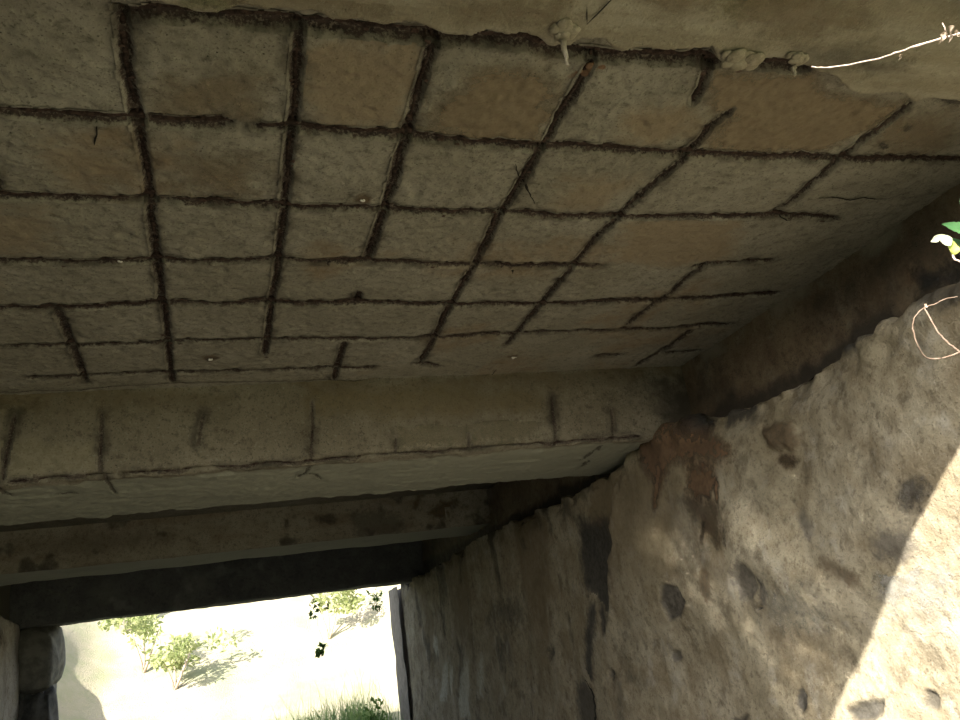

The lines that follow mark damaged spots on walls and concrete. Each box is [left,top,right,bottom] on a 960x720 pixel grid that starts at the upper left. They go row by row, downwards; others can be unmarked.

corrosion [302,38,422,142]
corrosion [415,49,559,141]
corrosion [599,70,899,152]
corrosion [0,121,141,258]
spalling [0,1,960,384]
corrosion [534,167,756,273]
corrosion [639,422,733,511]
damp [864,477,950,636]
damp [571,500,618,720]